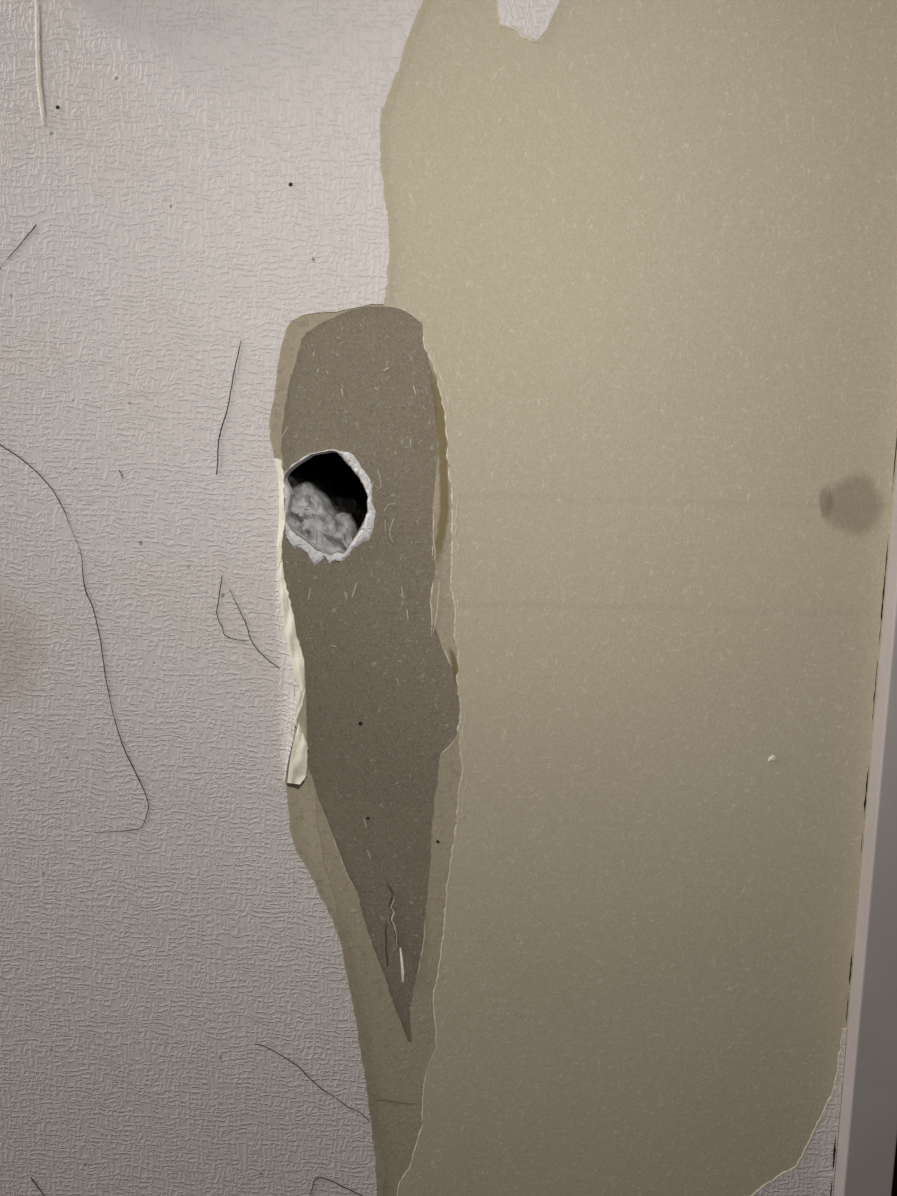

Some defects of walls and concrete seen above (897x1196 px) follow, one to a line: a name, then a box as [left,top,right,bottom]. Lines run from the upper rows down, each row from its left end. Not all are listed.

peeling [273,458,375,784]
peeling [380,0,897,1196]